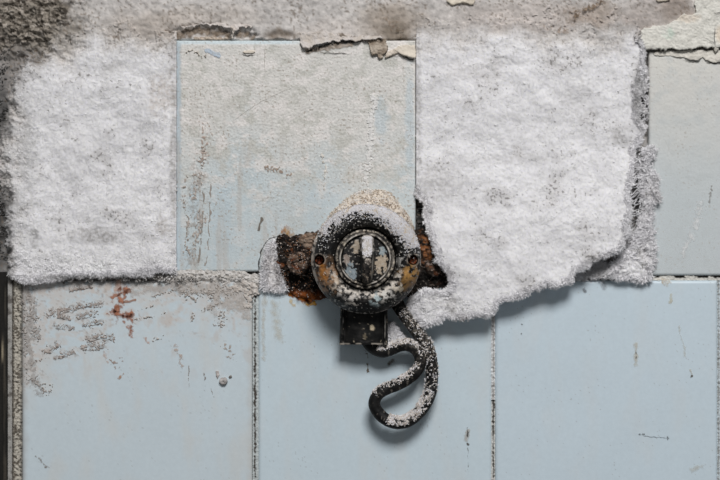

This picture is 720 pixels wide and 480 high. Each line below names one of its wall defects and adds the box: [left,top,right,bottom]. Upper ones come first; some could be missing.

spalling [165,22,255,58]
peeling [368,38,416,59]
peeling [639,0,720,63]
water stain [0,181,8,263]
water stain [630,164,644,242]
corrosion [277,229,322,306]
corrosion [106,280,136,337]